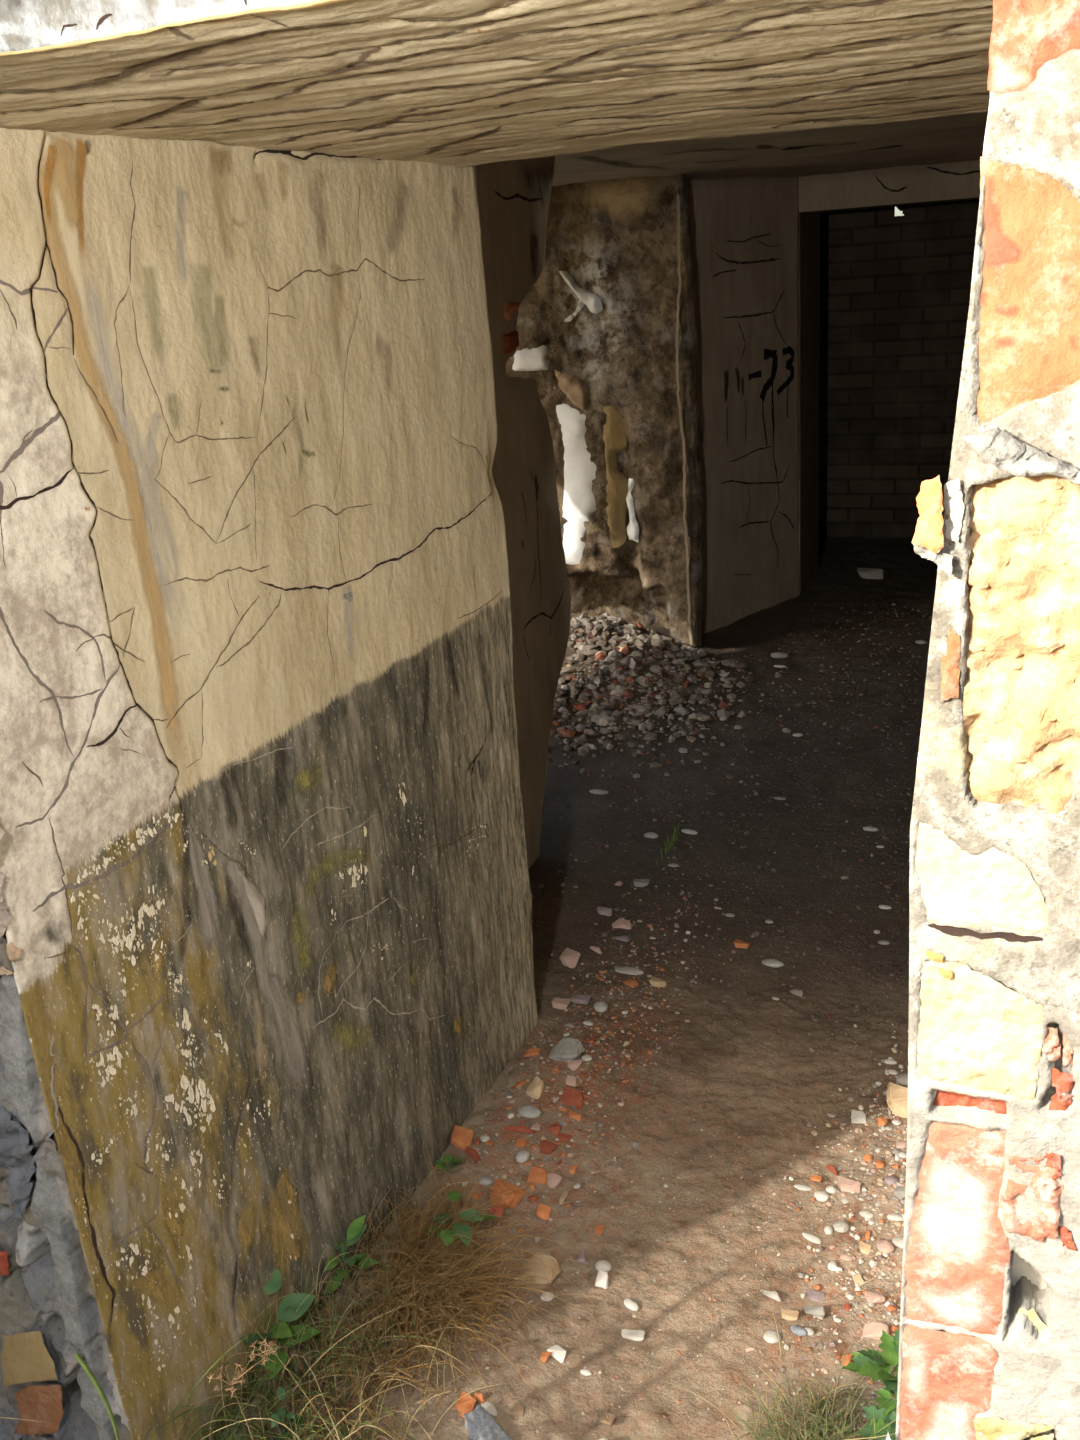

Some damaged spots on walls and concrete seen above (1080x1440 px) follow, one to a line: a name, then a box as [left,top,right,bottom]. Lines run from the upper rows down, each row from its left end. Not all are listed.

crack [60,14,112,36]
crack [169,28,190,40]
crack [244,0,289,28]
spalling [987,0,1080,92]
spalling [976,156,1080,423]
leakage [222,765,237,825]
crack [0,131,492,1326]
spalling [962,474,1080,815]
leakage [181,818,305,1084]
leakage [43,1053,97,1292]
leakage [270,1172,302,1263]
spalling [840,950,1077,1440]